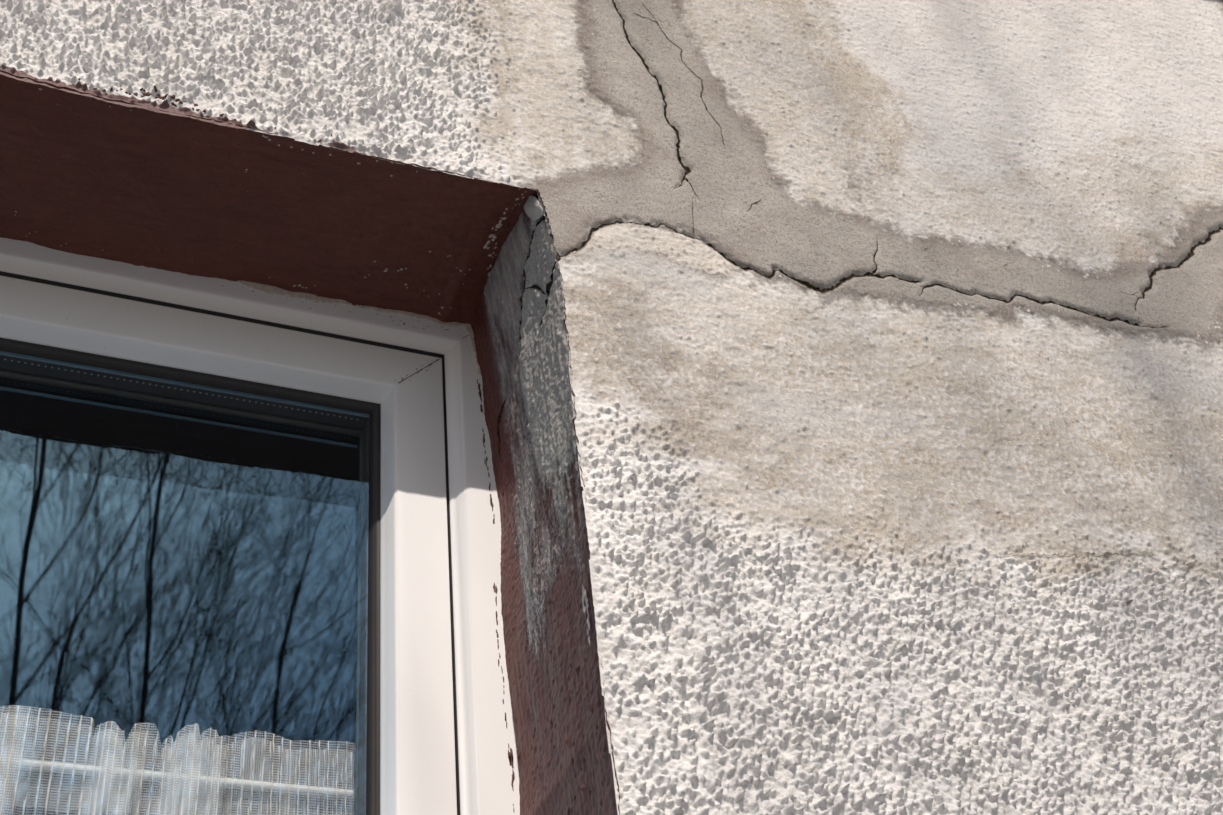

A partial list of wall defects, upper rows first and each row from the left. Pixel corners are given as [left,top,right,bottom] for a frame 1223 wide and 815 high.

crack [519,0,1223,355]
peeling [237,188,583,653]
peeling [582,585,590,645]